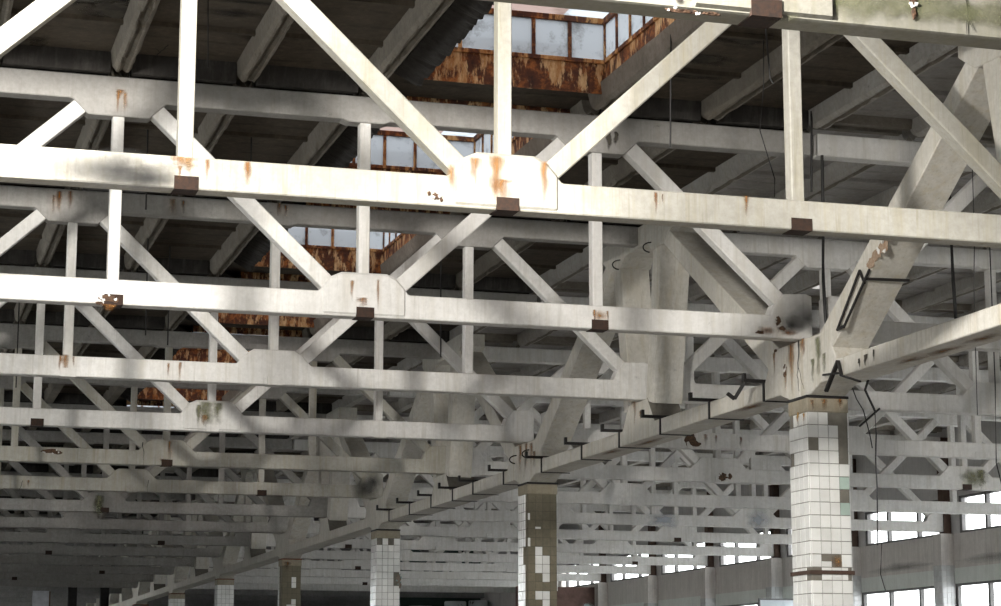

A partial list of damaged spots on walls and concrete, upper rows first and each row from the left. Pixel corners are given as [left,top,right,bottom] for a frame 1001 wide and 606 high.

corrosion [493,157,507,193]
corrosion [765,327,804,381]